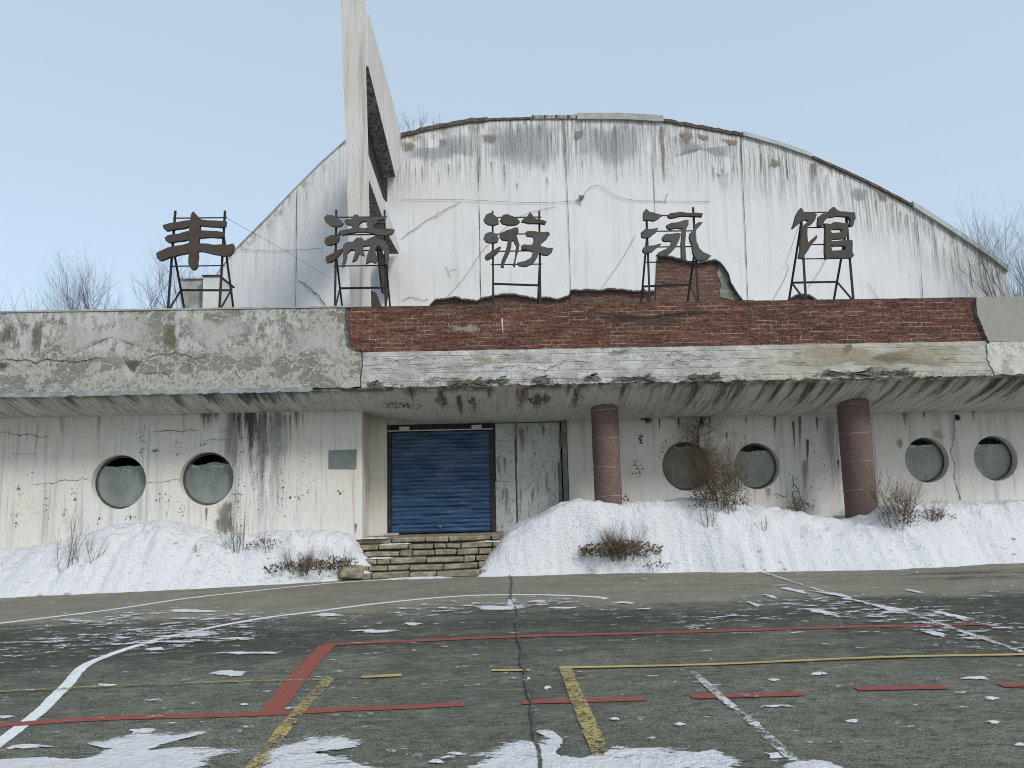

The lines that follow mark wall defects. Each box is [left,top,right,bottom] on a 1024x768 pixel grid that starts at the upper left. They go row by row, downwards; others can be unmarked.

spalling [429,255,742,306]
peeling [293,308,364,357]
crack [5,353,100,367]
crack [145,351,209,379]
spalling [435,375,511,408]
spalling [531,374,553,383]
spalling [584,373,656,382]
spalling [685,372,726,380]
leakage [233,392,293,459]
crack [508,575,544,768]